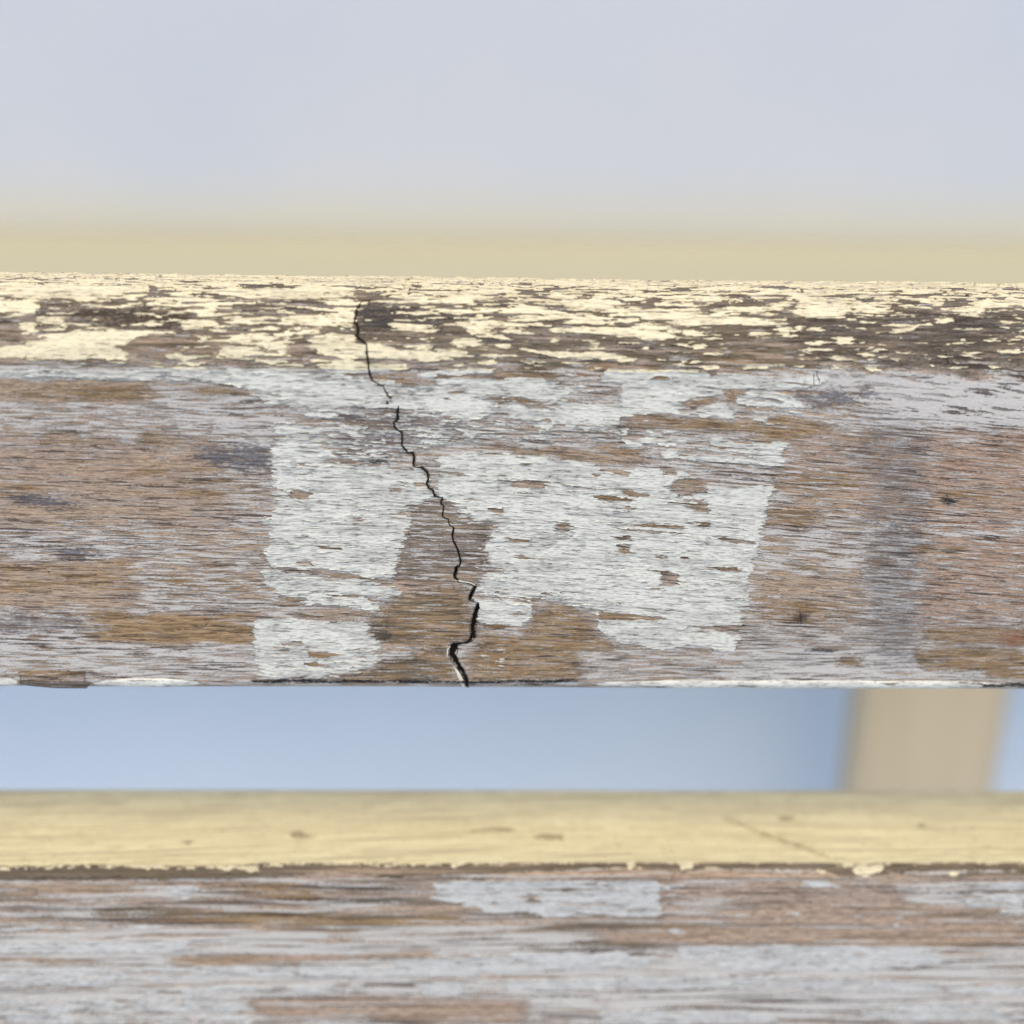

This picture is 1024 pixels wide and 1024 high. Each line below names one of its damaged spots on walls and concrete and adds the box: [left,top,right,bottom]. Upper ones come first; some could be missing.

crack [354,299,479,687]
peeling [0,272,1024,683]
peeling [0,861,1024,1024]